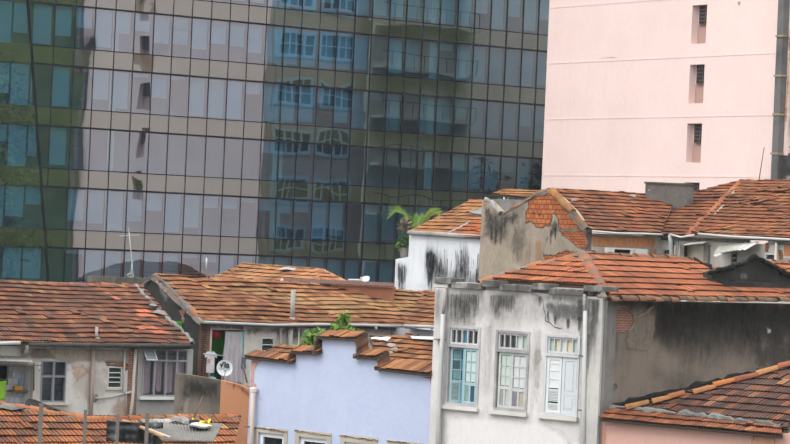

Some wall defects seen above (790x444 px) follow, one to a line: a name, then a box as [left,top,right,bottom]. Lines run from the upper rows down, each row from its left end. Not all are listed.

water stain [484,209,521,256]
flaking render [525,192,656,261]
water stain [396,264,405,289]
water stain [424,249,480,295]
water stain [451,295,477,317]
water stain [577,298,599,364]
peeling [616,304,655,350]
water stain [648,302,790,364]